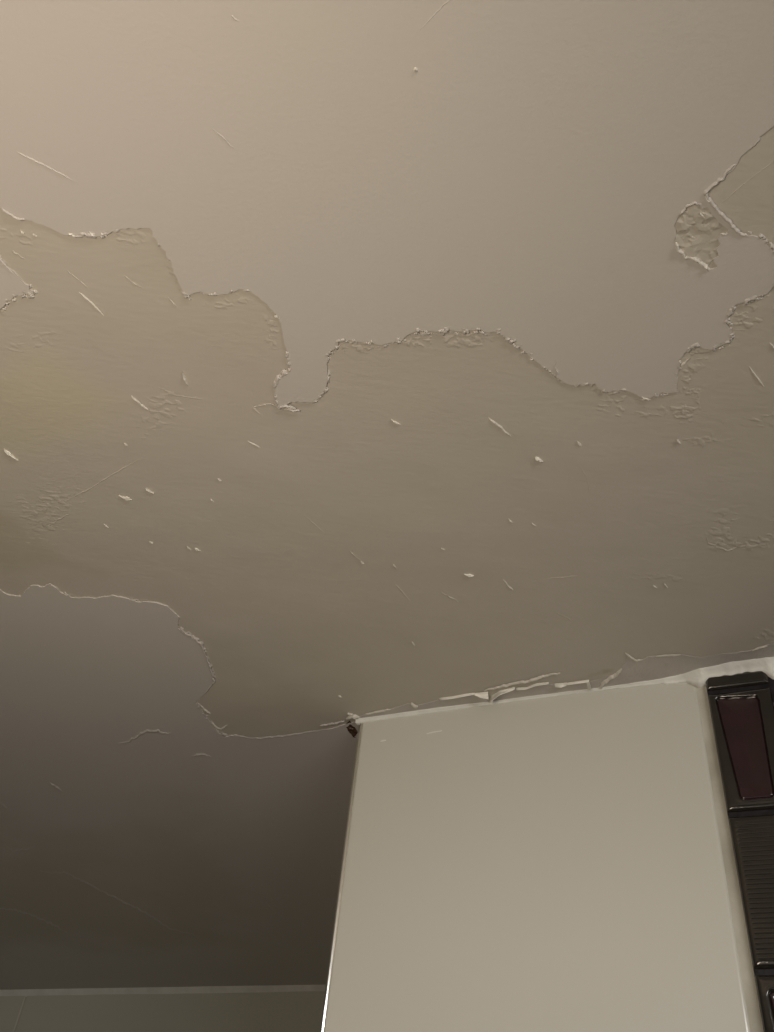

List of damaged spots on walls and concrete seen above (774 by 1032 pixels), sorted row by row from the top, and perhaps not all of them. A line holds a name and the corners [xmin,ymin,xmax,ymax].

spalling [674,126,774,271]
peeling [0,208,774,740]